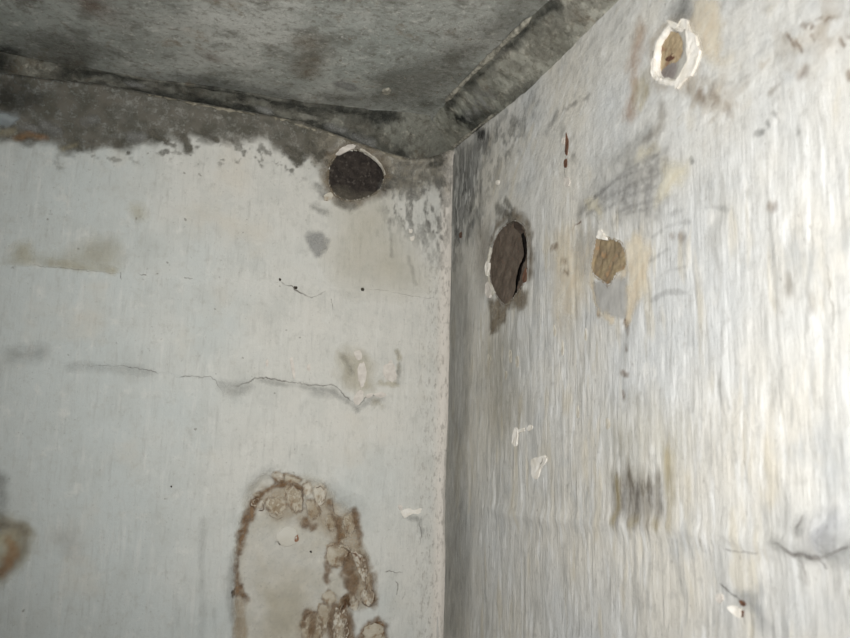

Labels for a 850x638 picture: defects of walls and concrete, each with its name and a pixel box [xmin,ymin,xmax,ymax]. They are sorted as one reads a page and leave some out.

peeling [651,58,661,81]
peeling [667,19,702,89]
water stain [0,48,447,204]
peeling [354,350,386,405]
peeling [512,425,533,447]
peeling [530,456,547,479]
spalling [235,471,375,638]